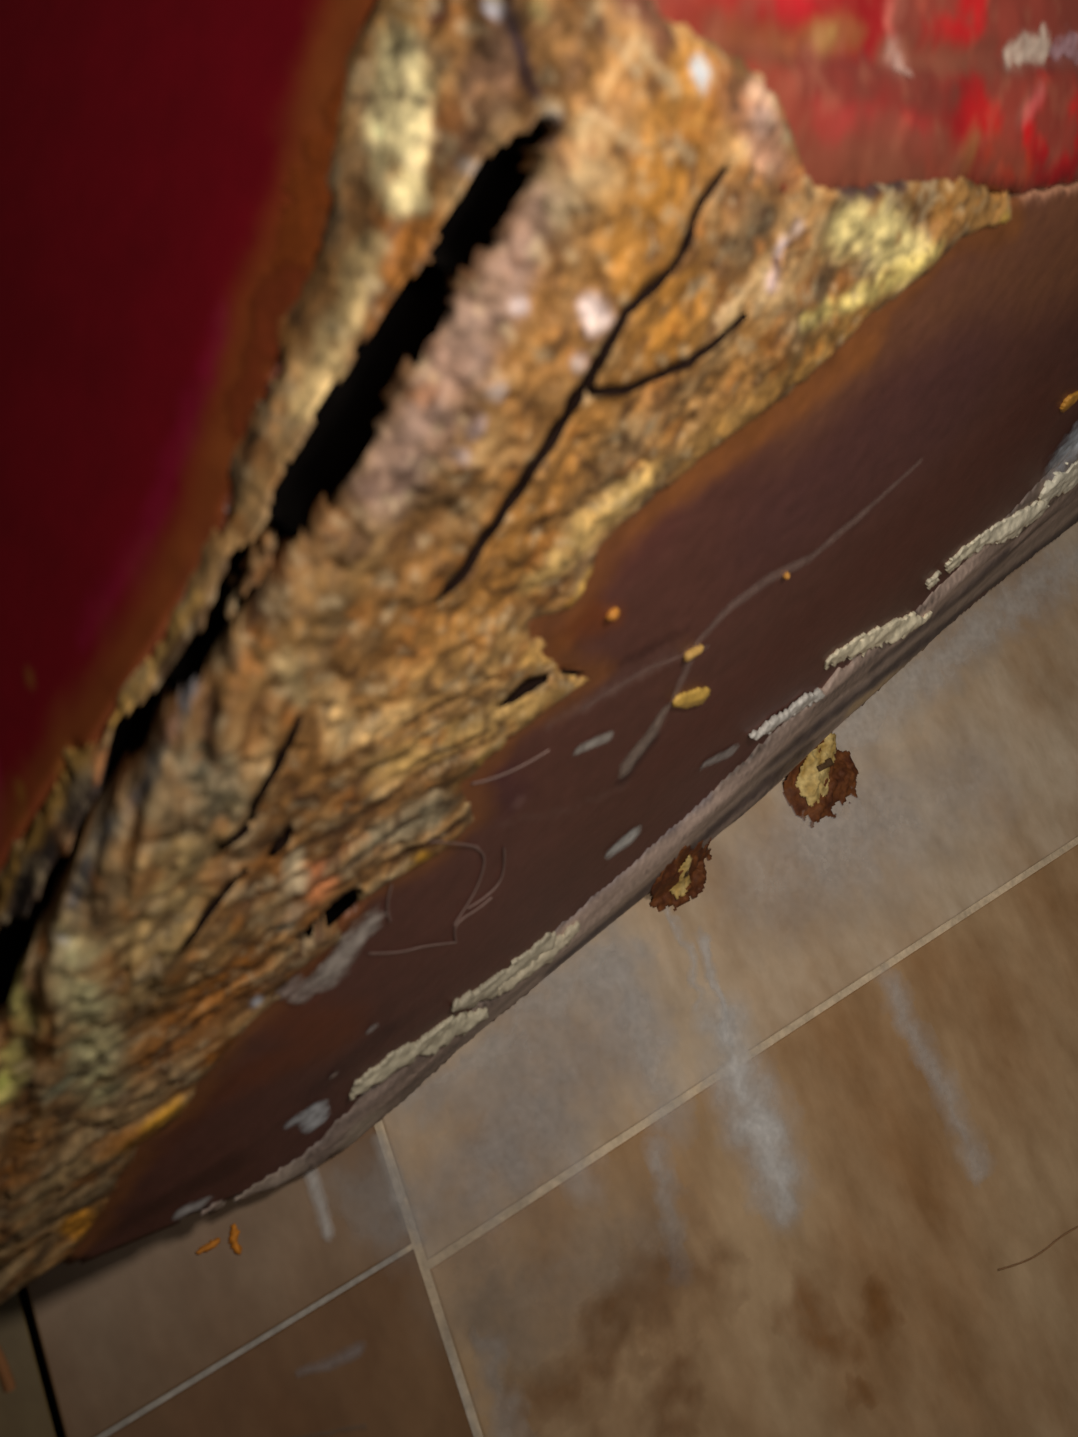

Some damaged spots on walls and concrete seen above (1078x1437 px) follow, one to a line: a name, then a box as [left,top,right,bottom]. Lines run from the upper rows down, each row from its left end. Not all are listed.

crack [434,166,748,603]
crack [0,122,550,1009]
peeling [925,461,1078,590]
peeling [824,611,933,670]
peeling [576,733,612,754]
peeling [702,687,825,767]
rust [782,732,859,829]
peeling [608,828,639,855]
rust [650,838,712,912]
peeling [349,921,581,1101]
peeling [288,1103,327,1130]
peeling [175,1198,208,1218]